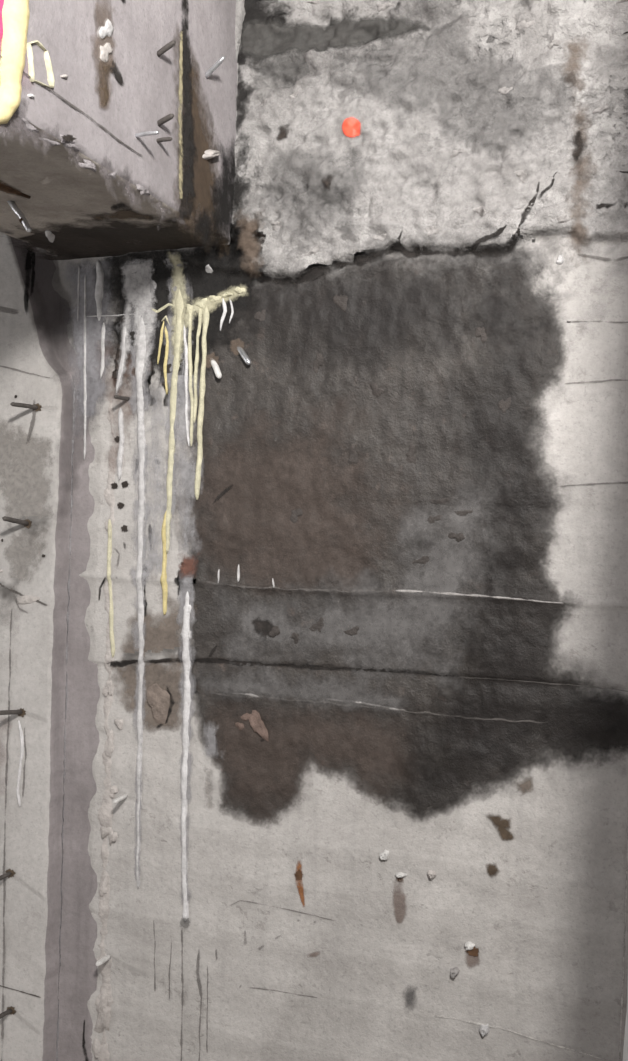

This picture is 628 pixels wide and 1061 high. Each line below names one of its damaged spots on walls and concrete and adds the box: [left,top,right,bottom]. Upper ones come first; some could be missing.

water stain [27,40,68,98]
water stain [95,5,124,108]
water stain [236,0,586,252]
crack [258,173,556,284]
crack [579,253,628,261]
crack [597,202,628,210]
water stain [0,409,50,590]
water stain [16,146,628,922]
corrosion [294,862,305,906]